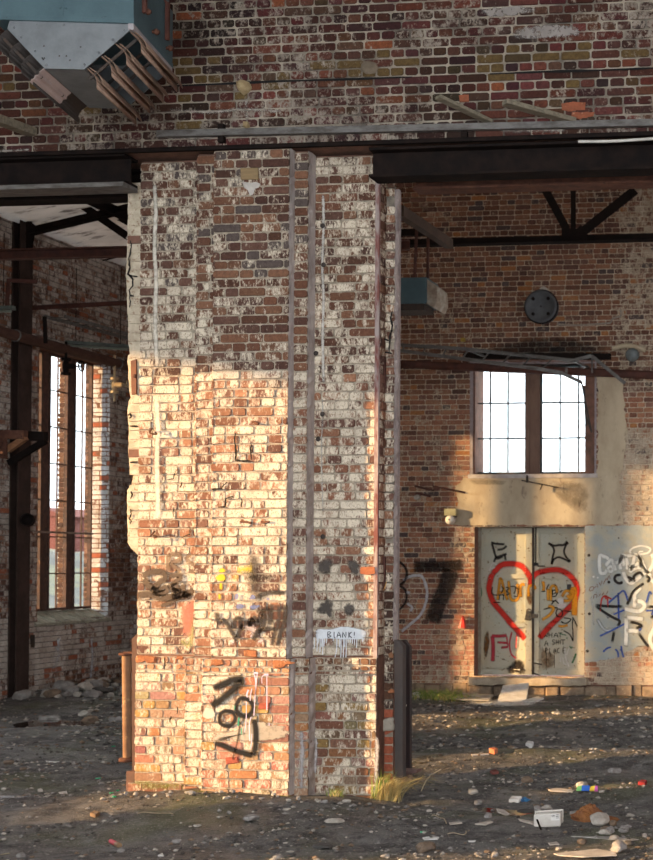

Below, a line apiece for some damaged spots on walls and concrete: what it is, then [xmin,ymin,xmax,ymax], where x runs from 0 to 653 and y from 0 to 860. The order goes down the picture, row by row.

crack [127,241,138,308]